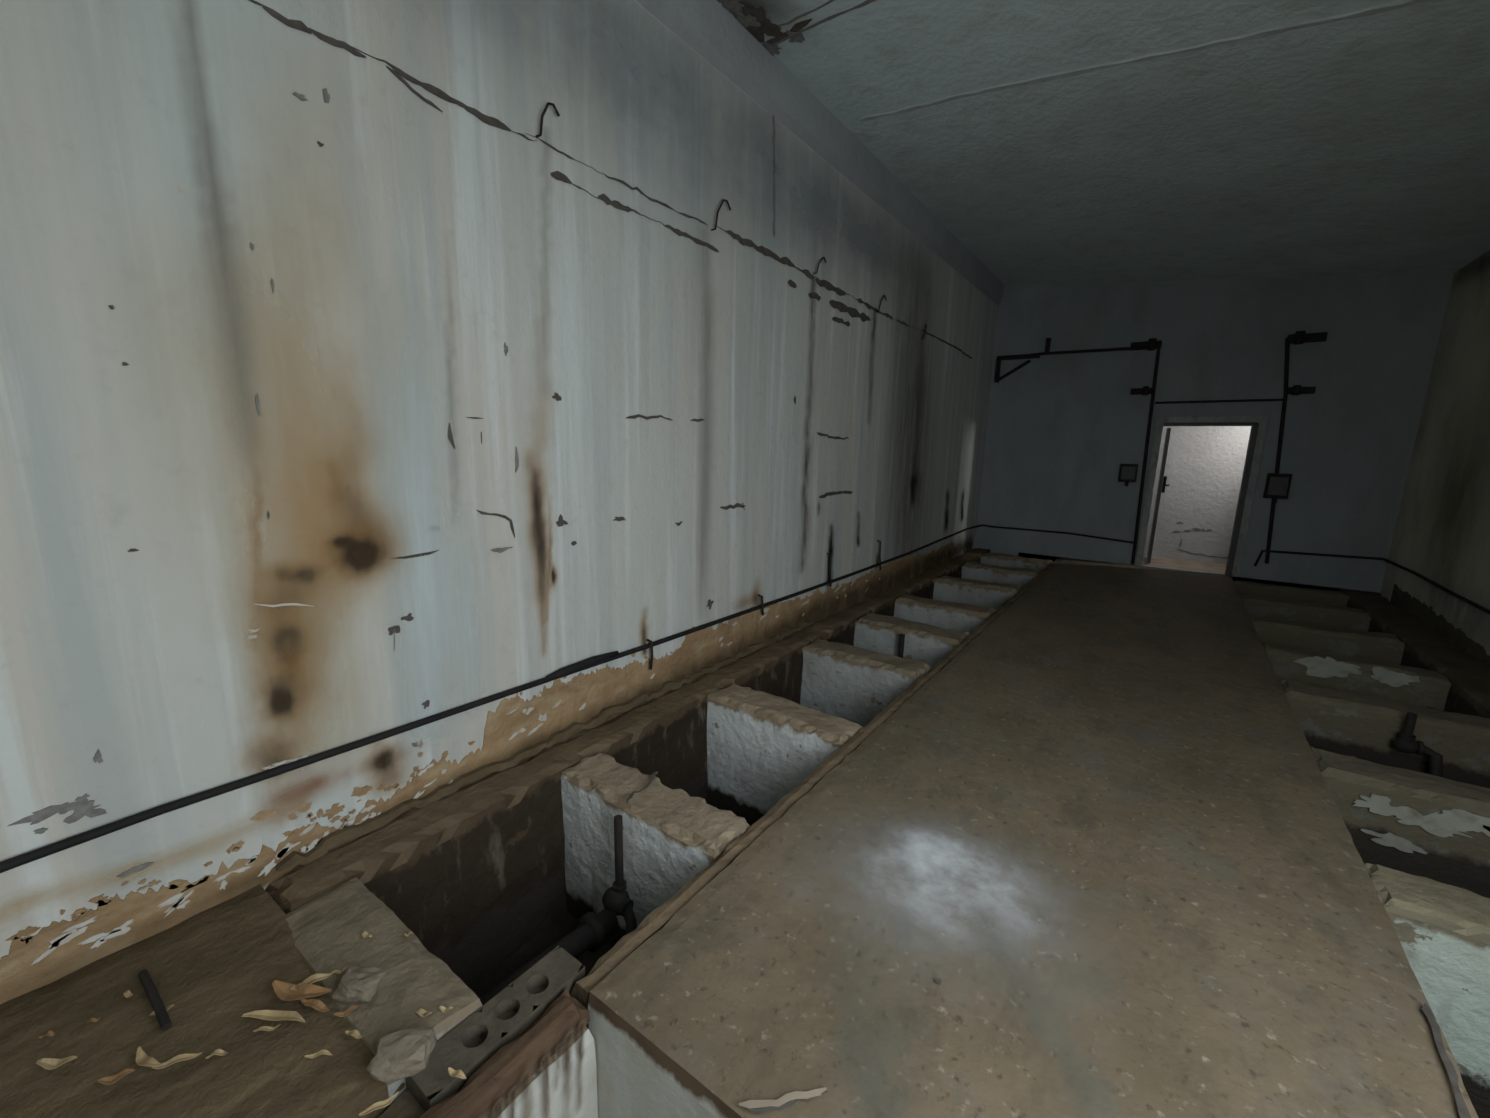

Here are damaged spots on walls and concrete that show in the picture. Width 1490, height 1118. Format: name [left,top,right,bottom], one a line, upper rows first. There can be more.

corrosion [239,321,390,719]
corrosion [531,469,556,607]
corrosion [258,742,290,770]
corrosion [370,748,398,785]
peeling [0,539,972,1004]
water stain [871,830,1029,932]